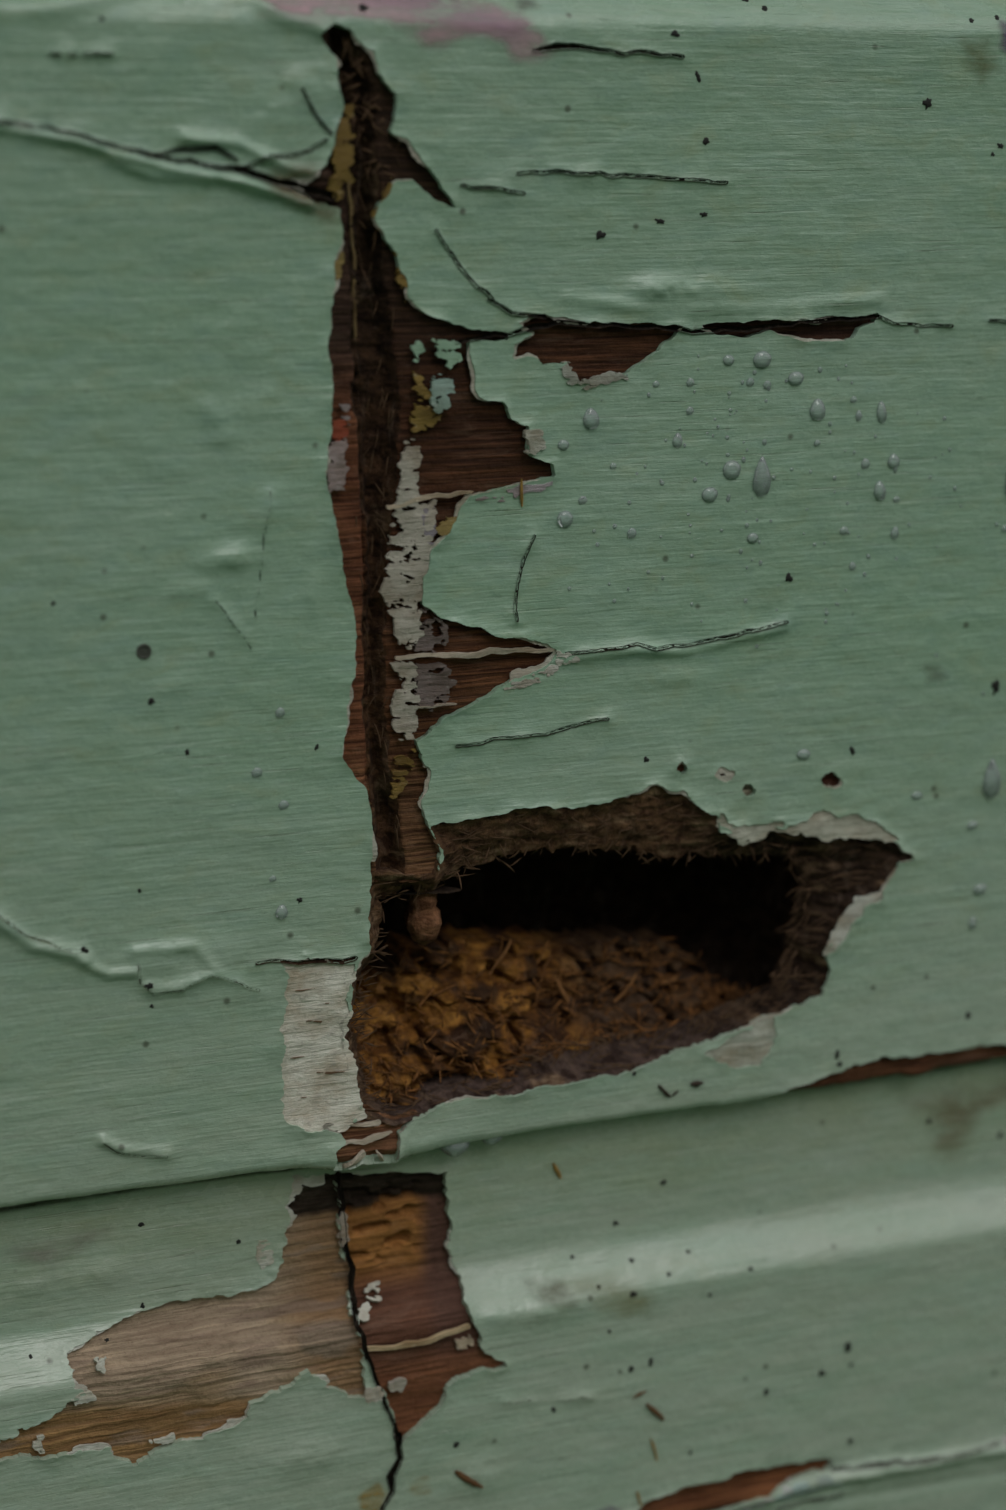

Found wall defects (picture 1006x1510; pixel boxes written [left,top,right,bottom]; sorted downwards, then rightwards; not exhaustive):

crack [0,87,338,201]
peeling [701,314,875,342]
peeling [273,25,682,883]
peeling [715,767,753,796]
peeling [821,772,842,789]
peeling [716,810,898,846]
peeling [823,892,883,957]
peeling [787,1044,1006,1091]
peeling [0,958,504,1463]
crack [335,1171,404,1510]
peeling [639,1459,844,1510]